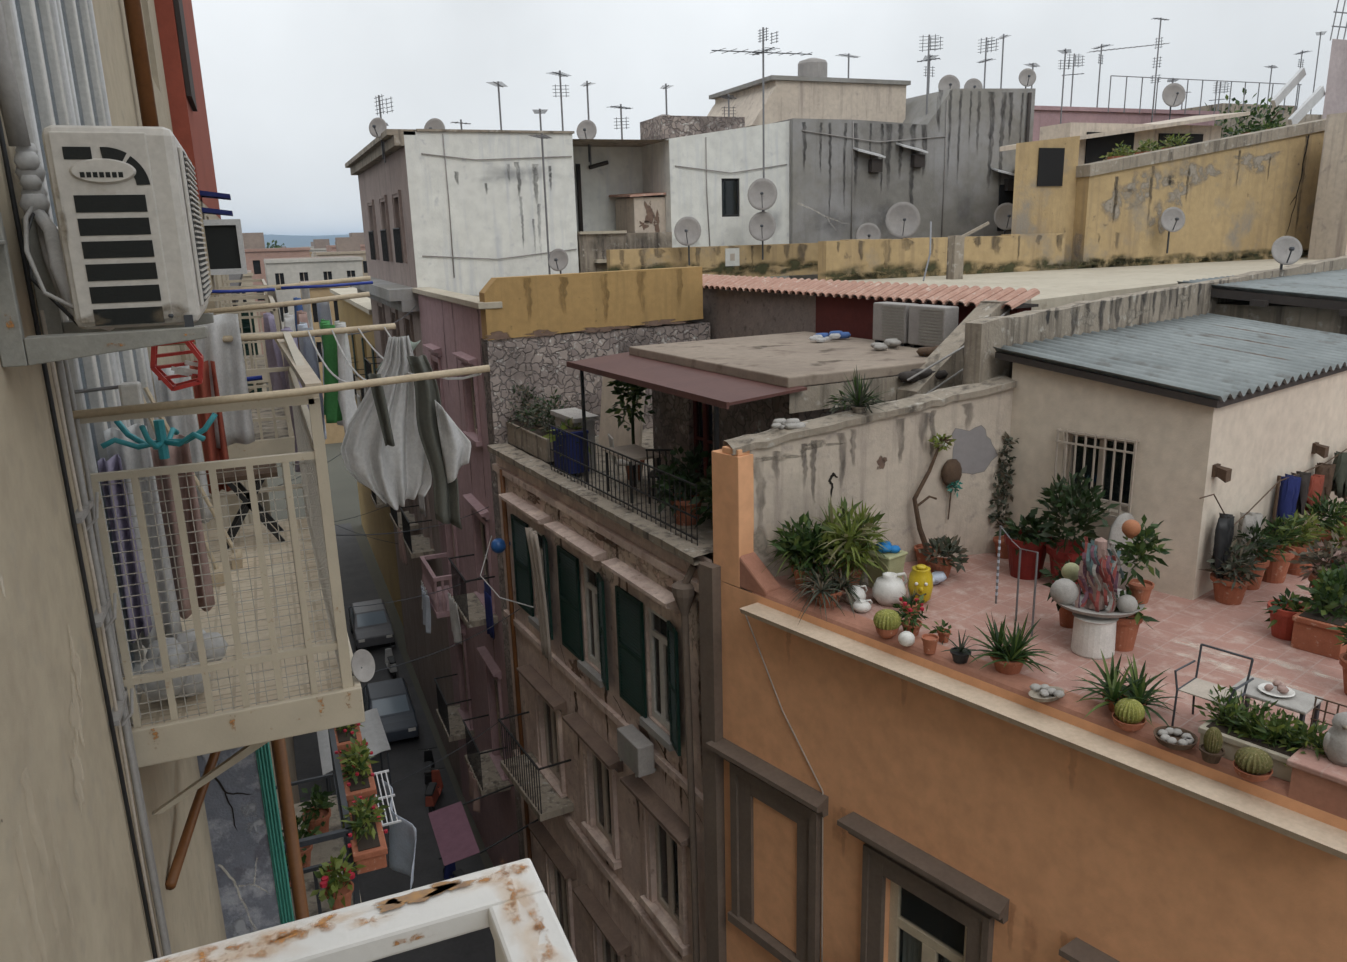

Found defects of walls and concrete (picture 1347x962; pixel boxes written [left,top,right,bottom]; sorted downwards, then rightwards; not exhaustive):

water stain [802,92,1024,204]
flaking render [1103,163,1221,233]
crack [1287,135,1310,231]
rust [362,865,545,930]
rust [256,915,334,955]